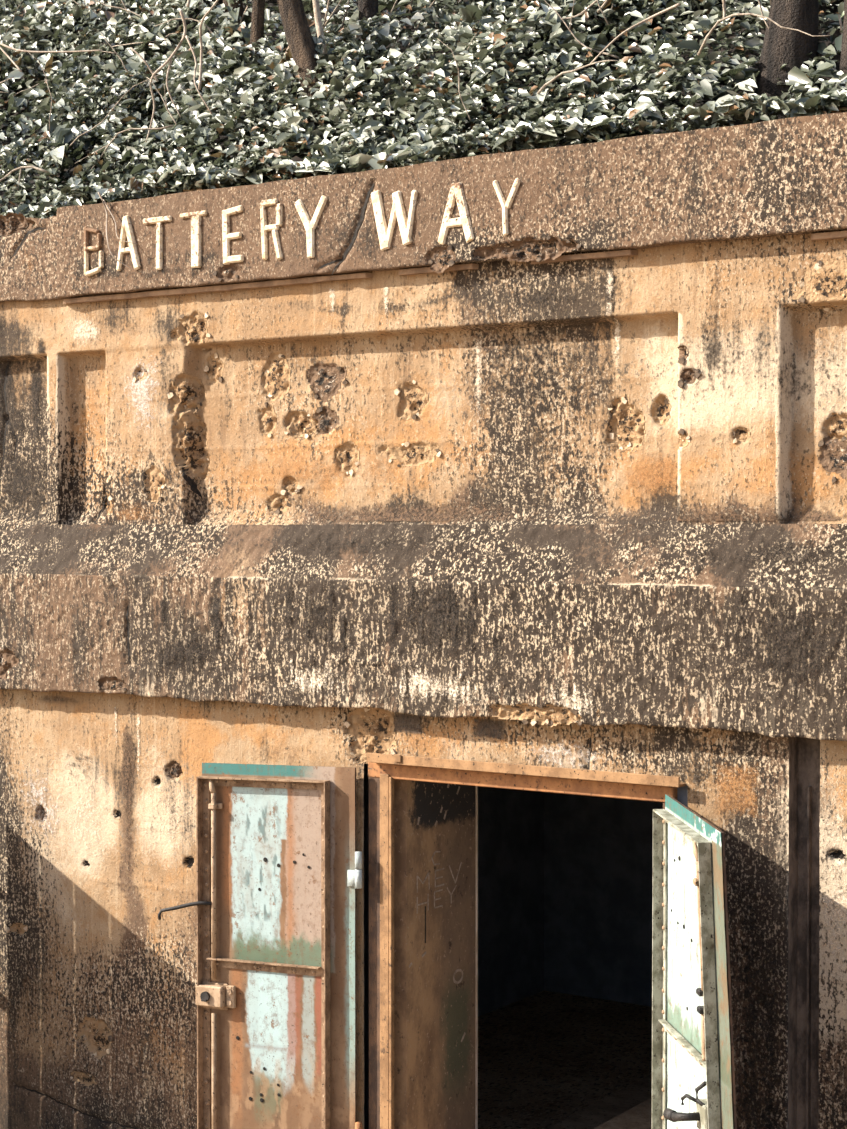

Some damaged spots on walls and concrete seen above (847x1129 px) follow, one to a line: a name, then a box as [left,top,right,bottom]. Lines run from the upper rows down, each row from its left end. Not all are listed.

spalling [473,235,582,262]
spalling [144,309,224,503]
spalling [258,351,349,439]
spalling [334,441,360,477]
spalling [818,413,847,483]
leakage [285,582,345,693]
leakage [388,583,487,706]
leakage [474,719,504,738]
spalling [489,703,583,727]
leakage [551,683,593,716]
leakage [114,707,140,863]
crack [17,1086,137,1129]